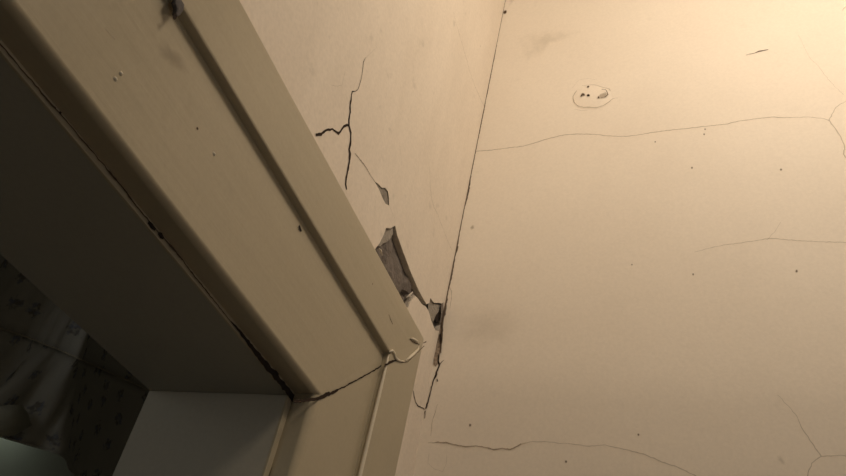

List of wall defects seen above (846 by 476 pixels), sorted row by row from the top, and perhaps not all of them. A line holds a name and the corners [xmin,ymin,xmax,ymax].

crack [294,0,506,418]
flaking render [375,226,444,367]